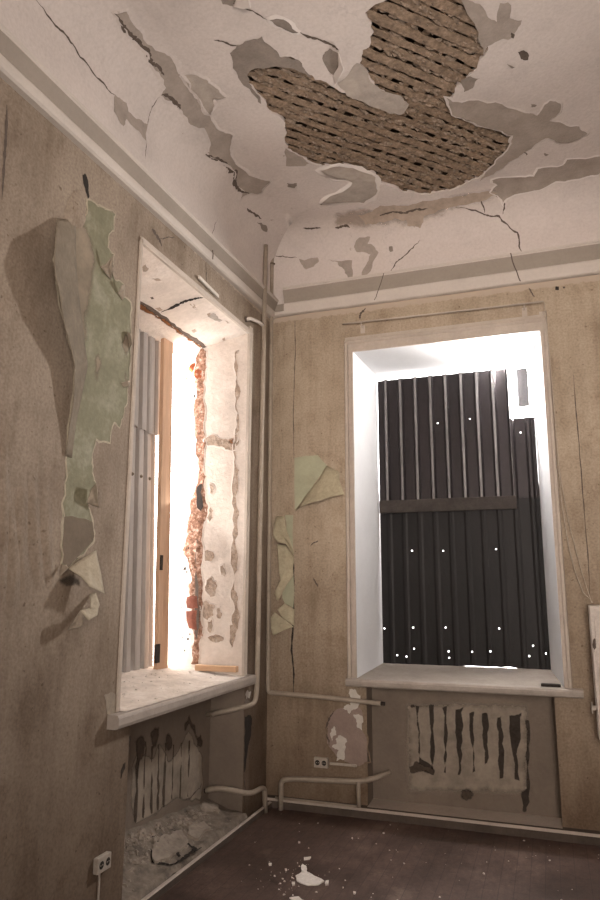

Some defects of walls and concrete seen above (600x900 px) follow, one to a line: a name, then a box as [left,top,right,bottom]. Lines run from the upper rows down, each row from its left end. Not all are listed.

peeling [111,8,271,232]
flaking render [215,0,600,228]
crack [162,223,216,312]
crack [359,240,420,319]
crack [456,196,535,297]
flaking render [63,516,94,567]
spalling [177,348,241,666]
peeling [325,689,371,769]